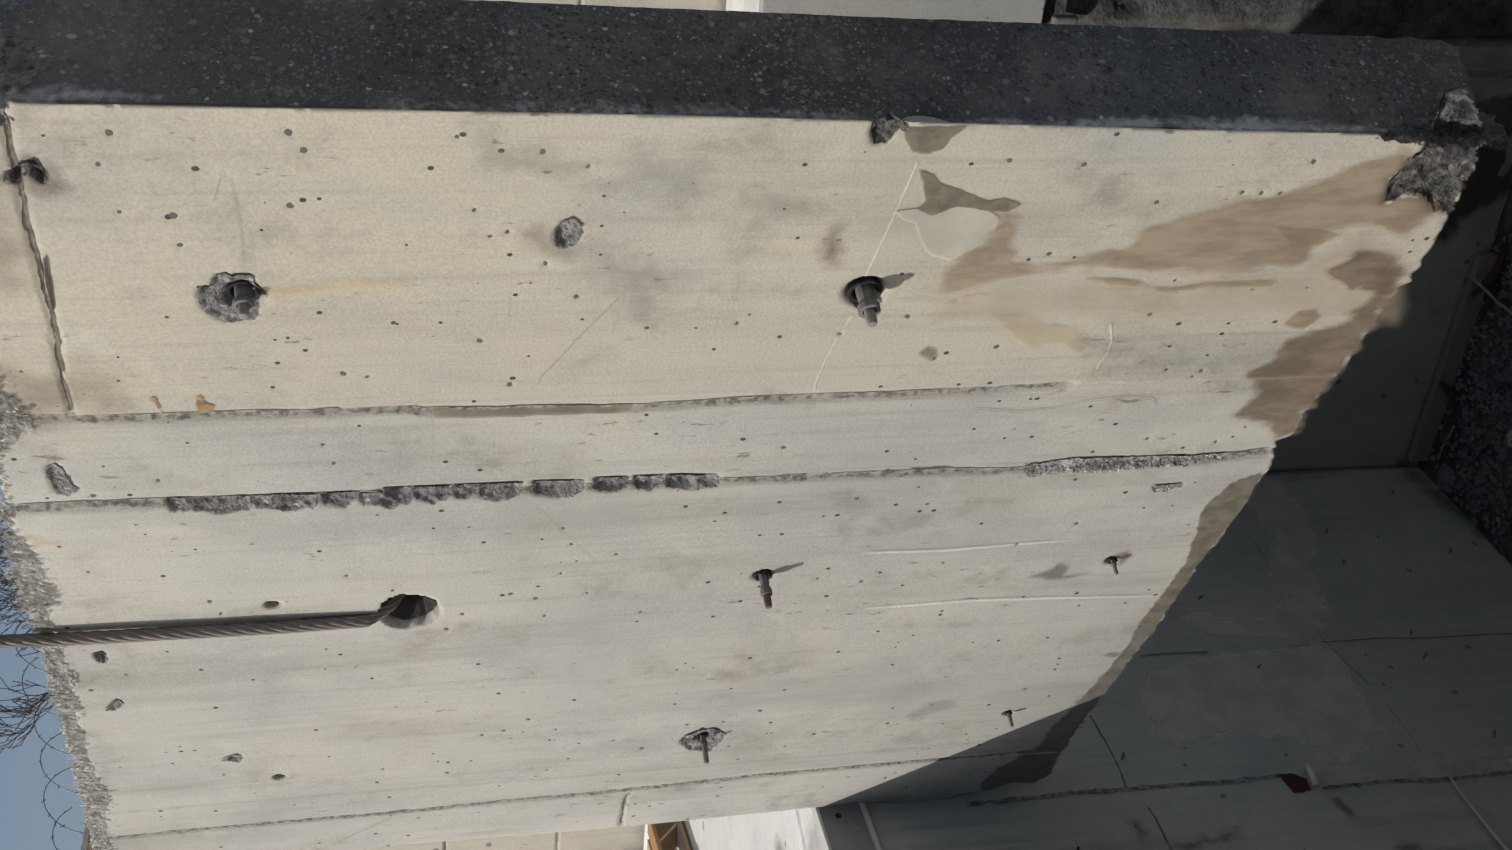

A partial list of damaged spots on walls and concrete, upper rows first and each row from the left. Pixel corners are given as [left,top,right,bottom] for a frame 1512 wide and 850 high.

spalling [0,22,40,126]
spalling [3,159,48,185]
spalling [1376,87,1512,213]
leakage [904,50,1512,439]
spalling [165,473,718,516]
spalling [0,370,119,850]
leakage [980,474,1512,791]
spalling [105,699,123,712]